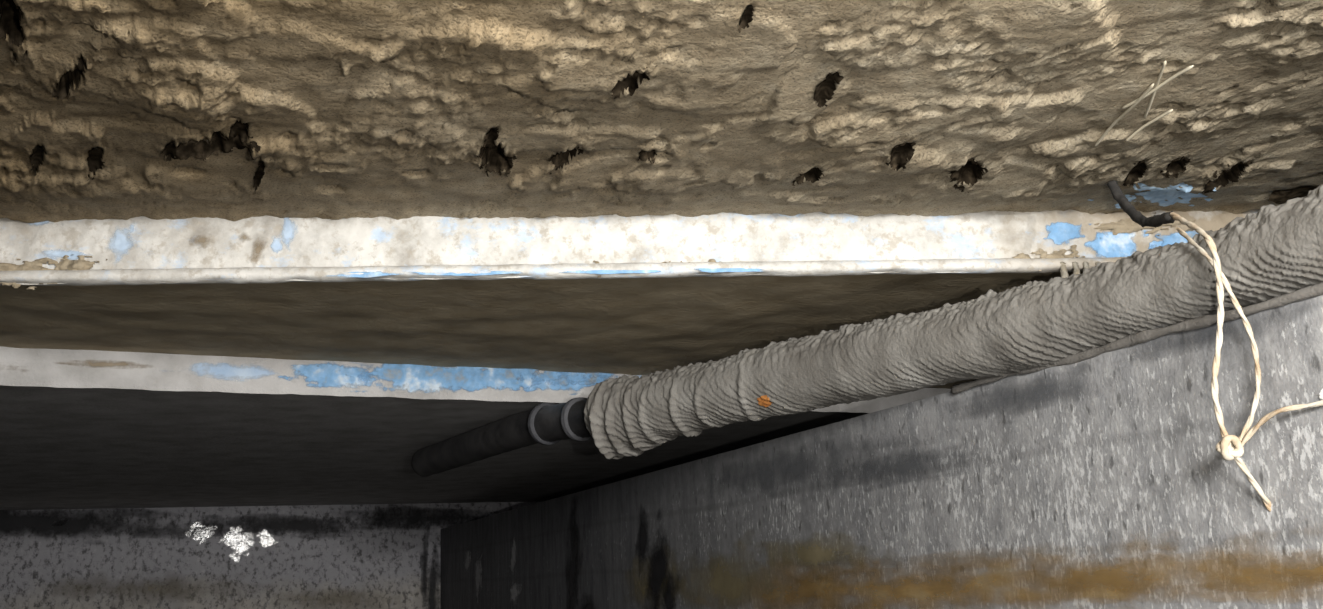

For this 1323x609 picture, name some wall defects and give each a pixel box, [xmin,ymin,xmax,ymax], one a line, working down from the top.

spalling [1115,156,1254,209]
peeling [1031,222,1198,259]
peeling [193,363,618,395]
damp [566,502,593,609]
damp [636,510,675,609]